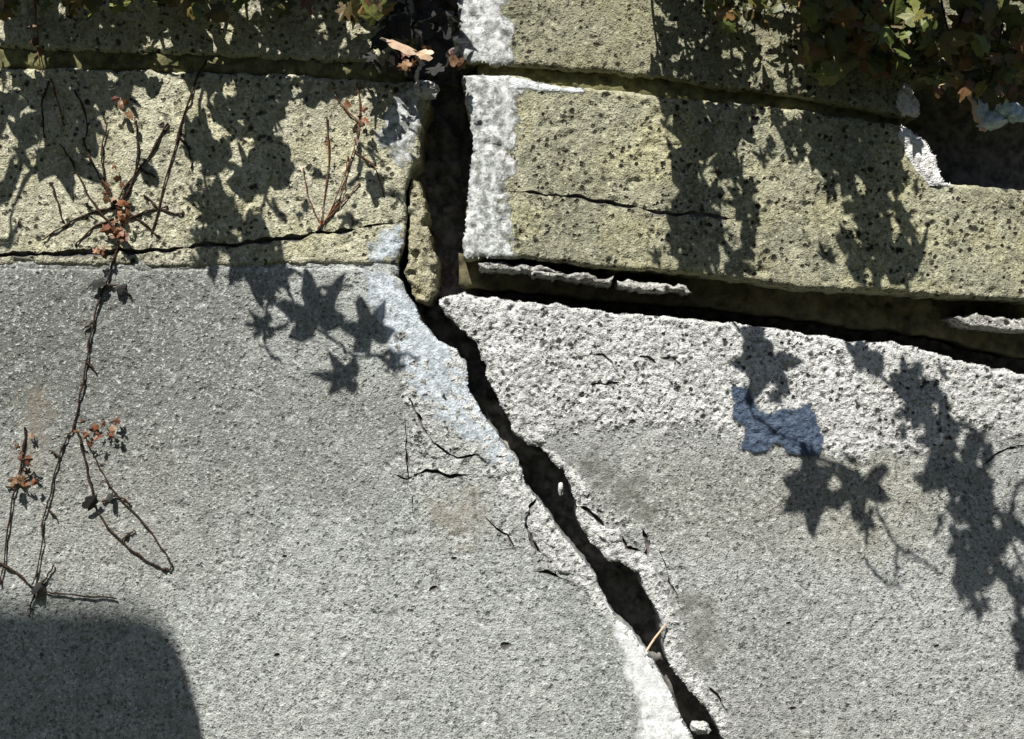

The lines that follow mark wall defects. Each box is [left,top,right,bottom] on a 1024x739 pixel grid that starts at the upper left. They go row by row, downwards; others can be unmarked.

crack [507,190,745,221]
crack [0,220,402,258]
crack [389,304,728,739]